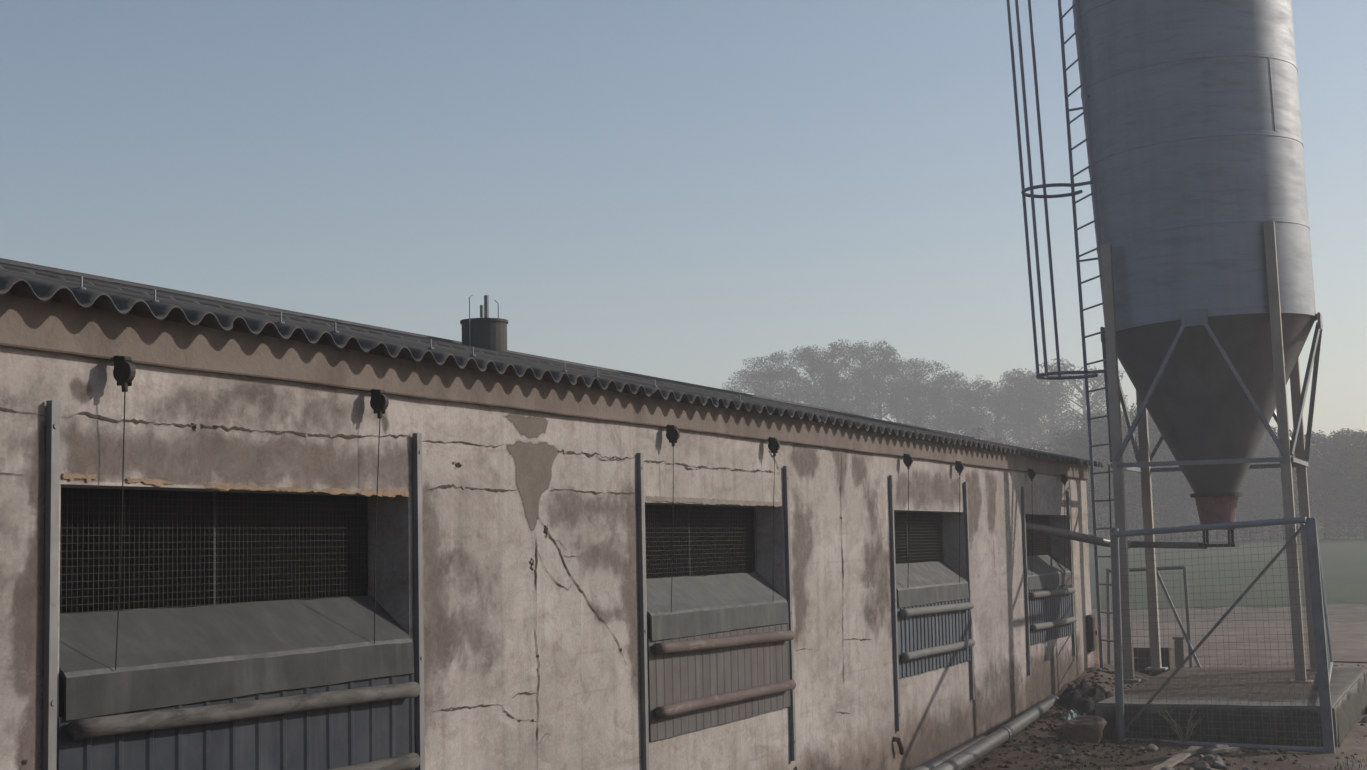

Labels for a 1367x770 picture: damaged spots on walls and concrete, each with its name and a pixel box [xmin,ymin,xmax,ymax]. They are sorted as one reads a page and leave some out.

crack [0,407,504,448]
damp [792,446,818,476]
damp [836,455,866,491]
damp [792,495,812,641]
crack [428,450,779,769]